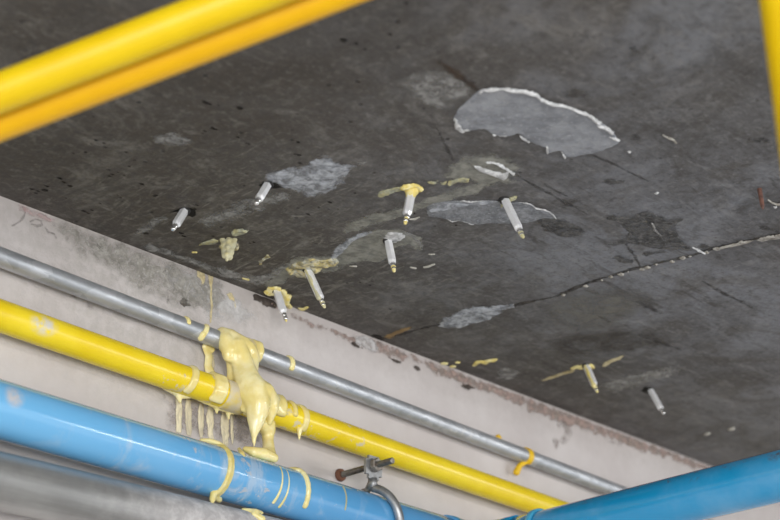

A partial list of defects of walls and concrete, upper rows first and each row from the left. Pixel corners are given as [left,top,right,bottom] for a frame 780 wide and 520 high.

peeling [453,87,620,159]
peeling [445,155,519,186]
peeling [426,200,584,237]
crack [482,233,780,314]